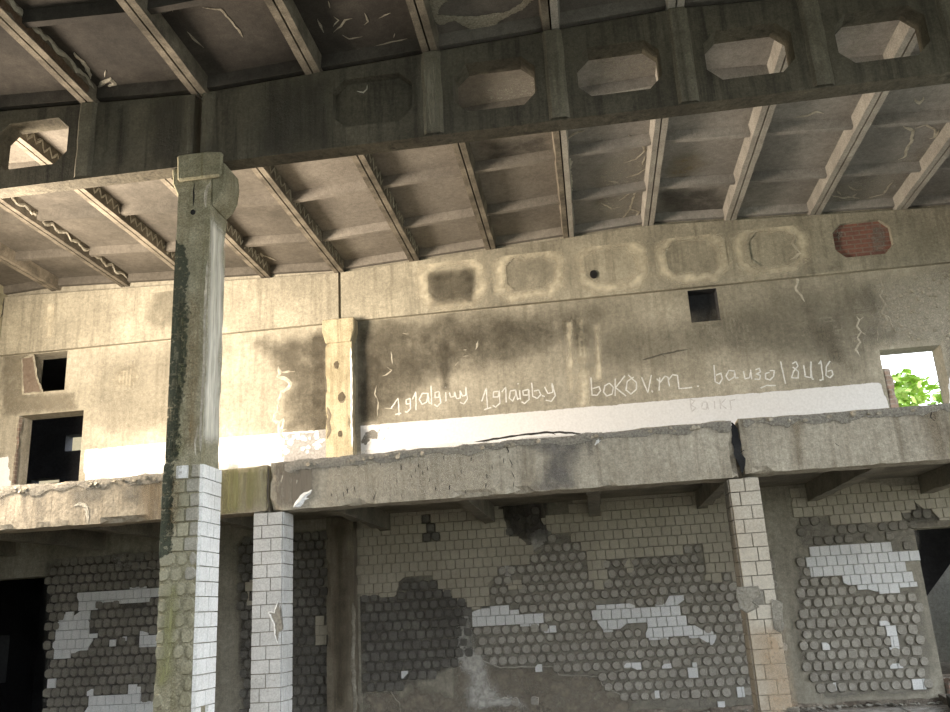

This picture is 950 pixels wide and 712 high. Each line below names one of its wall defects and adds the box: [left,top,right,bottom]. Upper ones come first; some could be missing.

damp [93,187,276,558]
damp [273,333,327,430]
damp [358,251,564,419]
damp [562,320,602,407]
crack [267,366,295,508]
crack [731,422,746,473]
spalling [736,586,783,633]